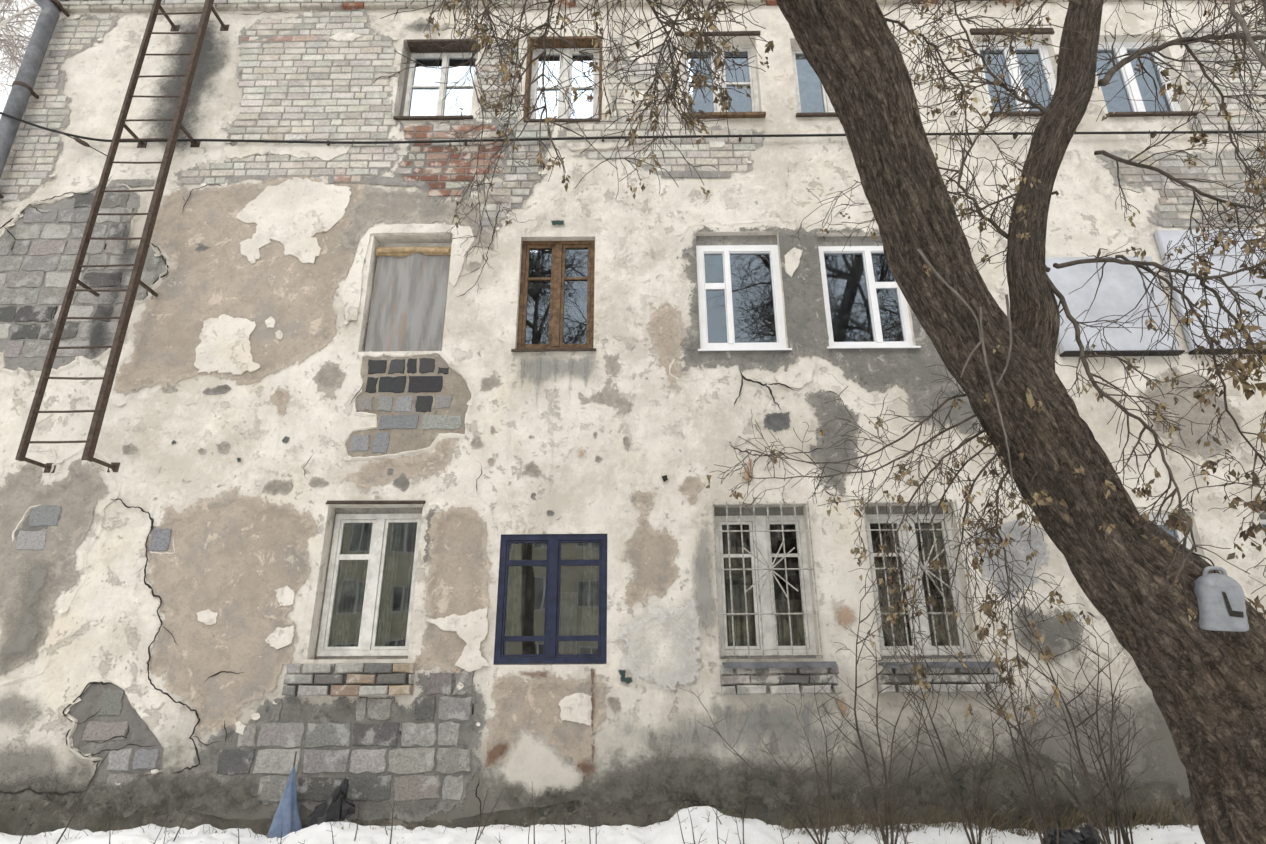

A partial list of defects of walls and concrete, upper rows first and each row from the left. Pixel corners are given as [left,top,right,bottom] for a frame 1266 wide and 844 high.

flaking render [0,14,120,204]
peeling [109,7,766,406]
peeling [270,388,290,415]
peeling [578,353,634,416]
peeling [0,444,137,688]
crack [110,498,242,774]
damp [0,695,40,728]
peeling [60,696,81,715]
crack [0,681,156,803]
damp [0,747,258,817]
damp [498,705,857,817]
damp [1021,697,1161,784]